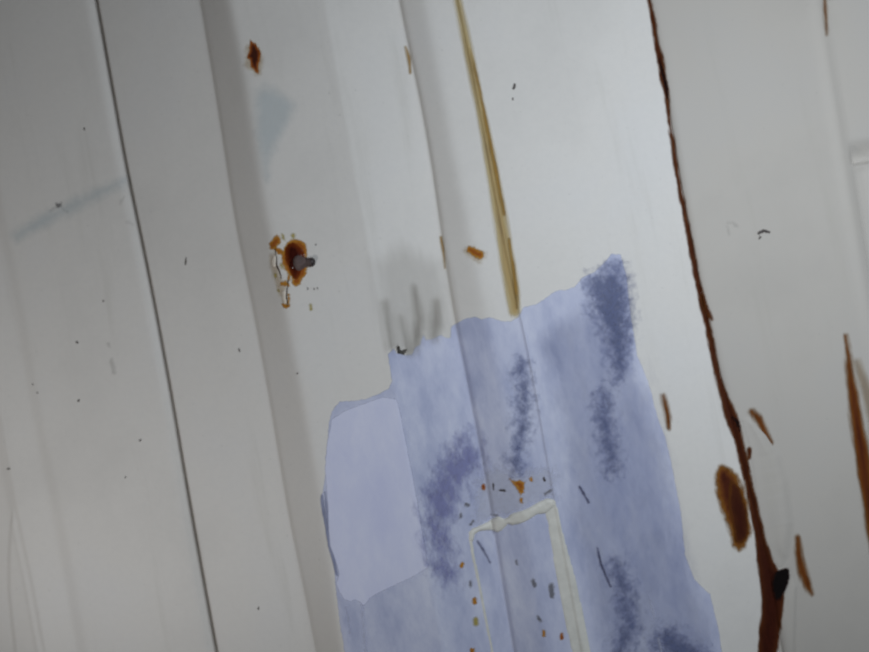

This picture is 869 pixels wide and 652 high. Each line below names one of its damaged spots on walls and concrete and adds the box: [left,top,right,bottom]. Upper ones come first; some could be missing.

rust [247,40,261,73]
rust [269,234,318,308]
rust [467,246,484,259]
rust [648,0,784,652]
leakage [512,360,527,468]
rust [844,334,869,539]
rust [796,536,813,595]
leakage [655,629,697,652]